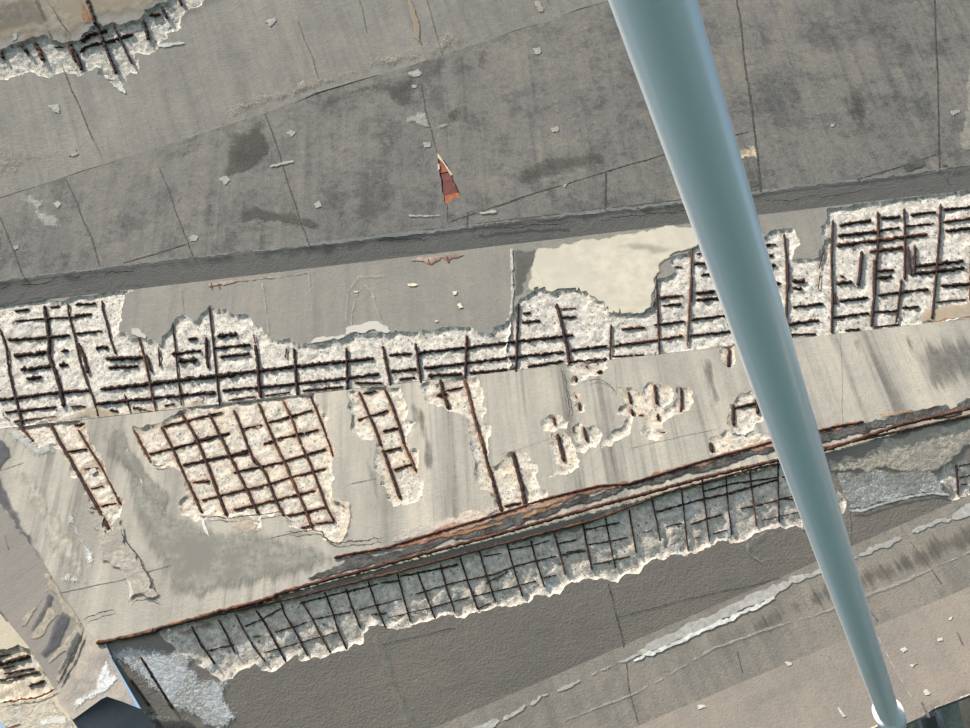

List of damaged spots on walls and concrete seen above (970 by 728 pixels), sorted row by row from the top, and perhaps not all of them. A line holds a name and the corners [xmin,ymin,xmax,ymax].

spalling [0,0,203,88]
spalling [764,190,970,339]
spalling [0,244,736,598]
rust [652,439,774,475]
spalling [708,390,770,455]
peeling [829,418,970,514]
rust [365,481,627,553]
spalling [160,462,805,681]
spalling [0,644,54,704]